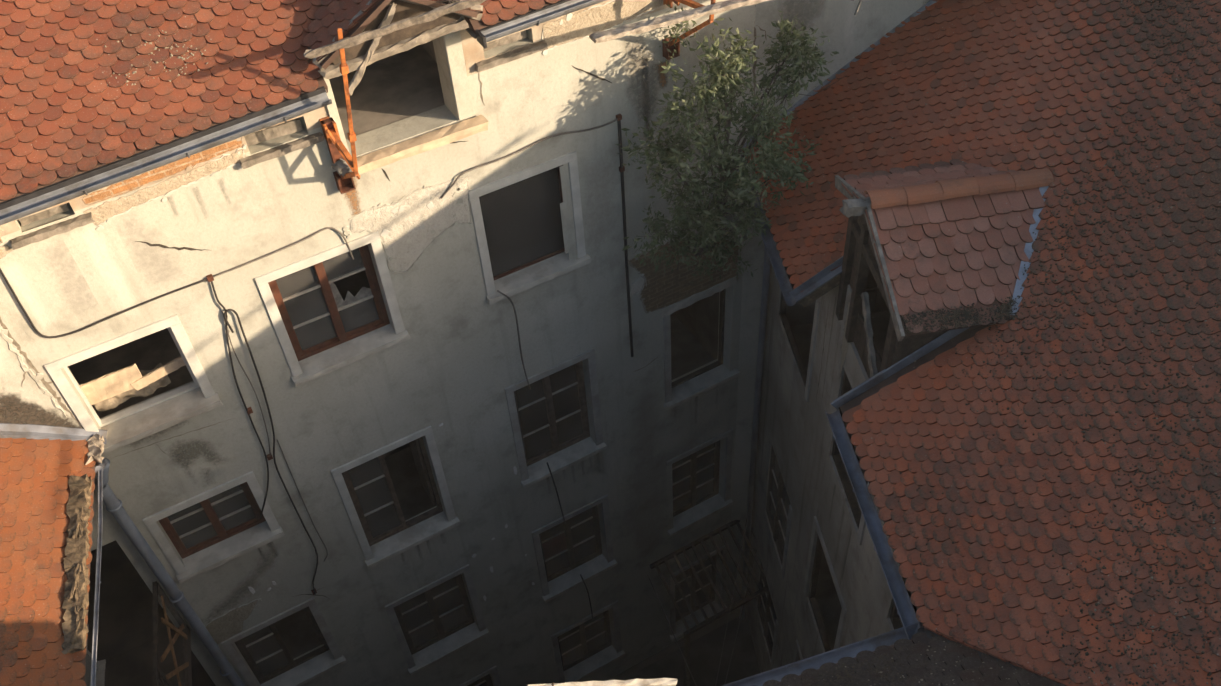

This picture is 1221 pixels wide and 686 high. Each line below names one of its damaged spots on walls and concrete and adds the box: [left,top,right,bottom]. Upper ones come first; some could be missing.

peeling [80,137,247,231]
spalling [343,176,473,274]
damp [0,190,211,428]